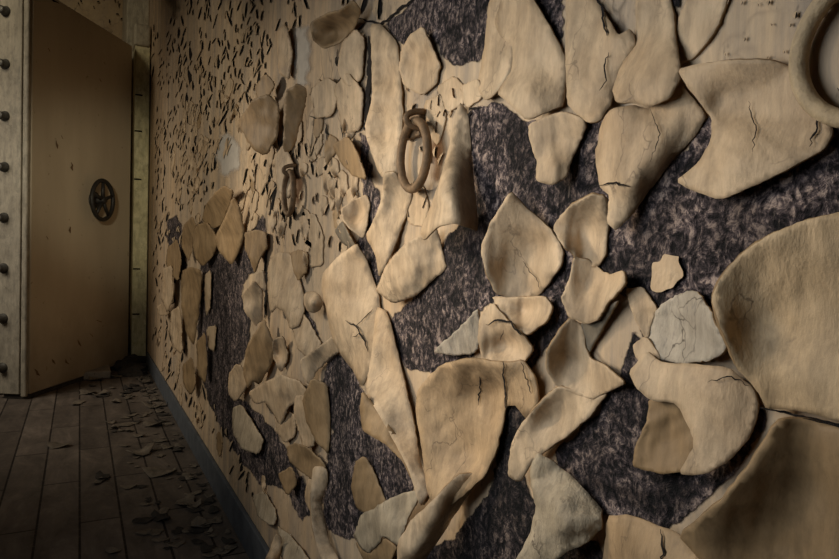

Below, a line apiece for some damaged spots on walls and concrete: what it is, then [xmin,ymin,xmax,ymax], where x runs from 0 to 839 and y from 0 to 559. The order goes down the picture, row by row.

peeling [185,0,222,29]
peeling [224,1,241,32]
peeling [240,0,262,21]
peeling [372,0,382,20]
peeling [207,29,229,70]
peeling [236,17,258,67]
peeling [274,0,300,79]
peeling [151,16,222,214]
peeling [211,30,307,239]